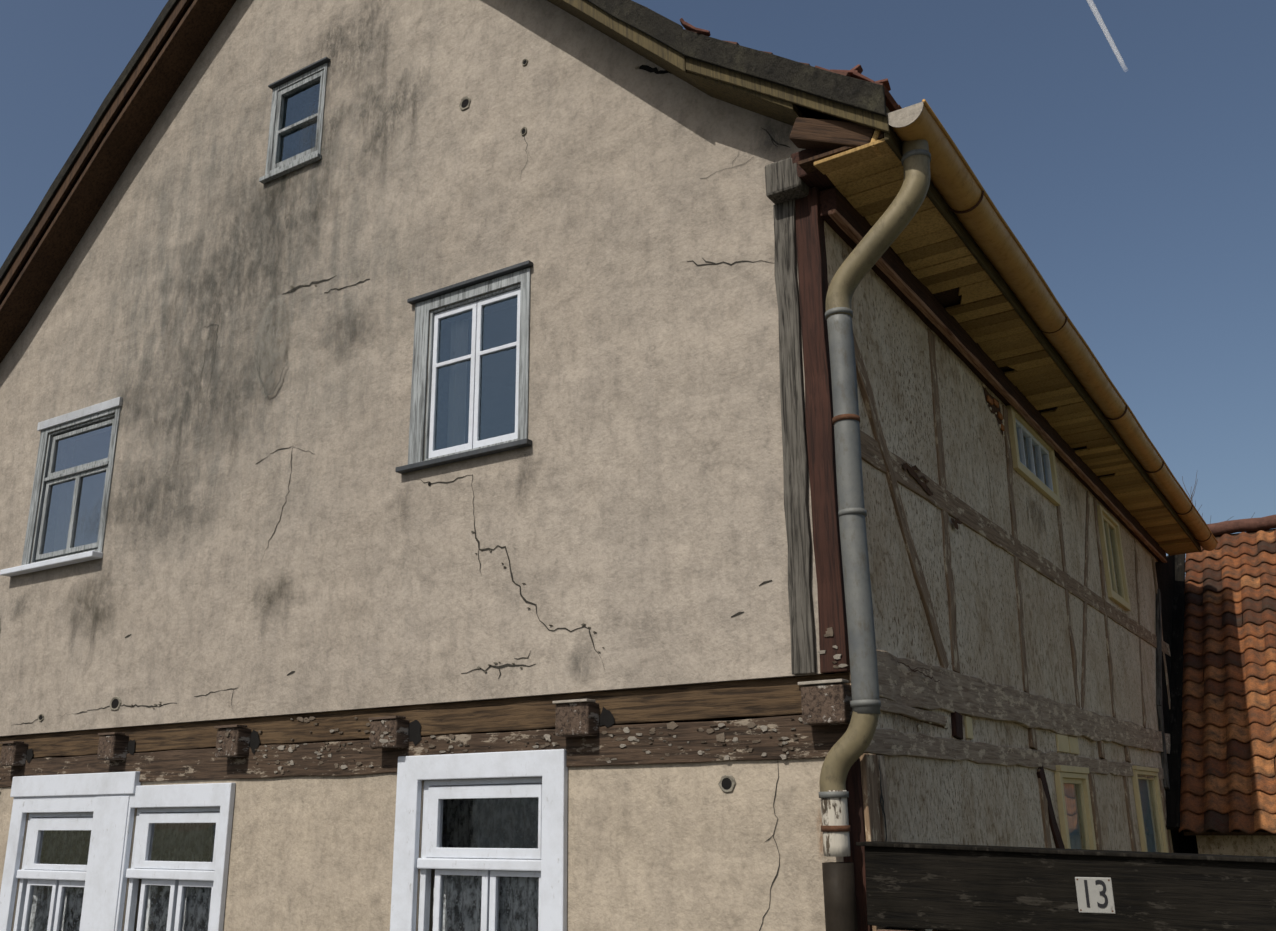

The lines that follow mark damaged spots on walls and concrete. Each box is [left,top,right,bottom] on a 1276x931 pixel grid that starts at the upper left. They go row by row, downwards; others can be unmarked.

crack [281,275,369,295]
crack [687,258,772,266]
crack [256,446,313,556]
crack [415,474,604,679]
crack [22,688,236,724]
peeling [253,717,394,775]
peeling [506,733,559,751]
peeling [602,717,802,763]
crack [759,771,780,931]